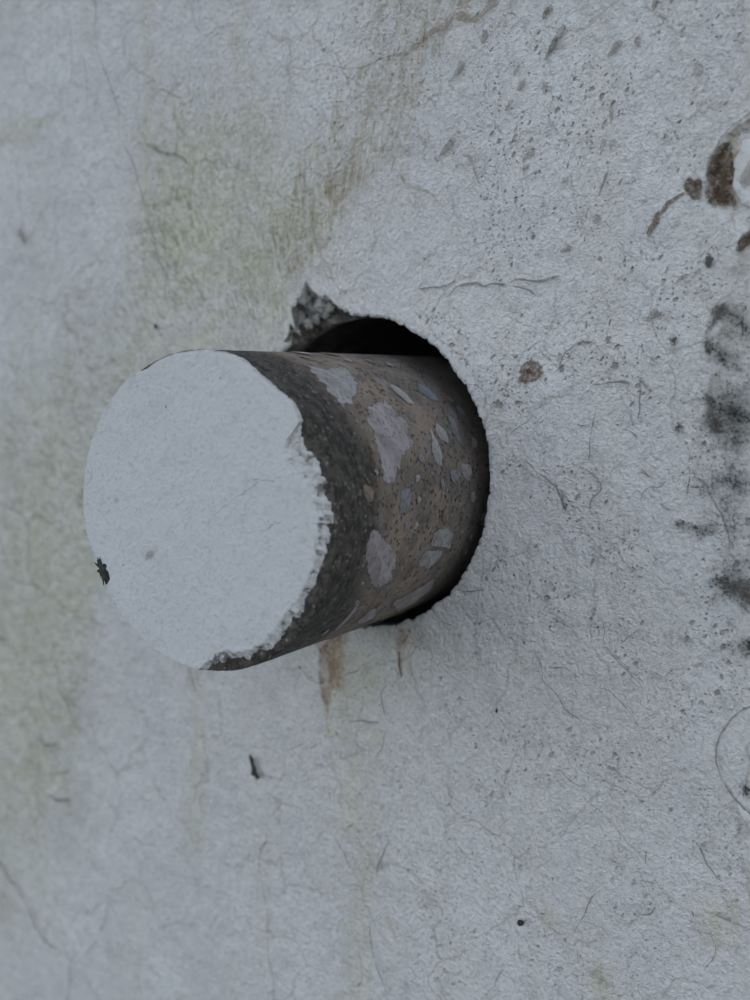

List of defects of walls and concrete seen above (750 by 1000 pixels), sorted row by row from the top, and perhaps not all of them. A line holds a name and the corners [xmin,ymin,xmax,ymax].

rust [647,143,736,235]
rust [737,231,750,251]
spalling [284,282,376,346]